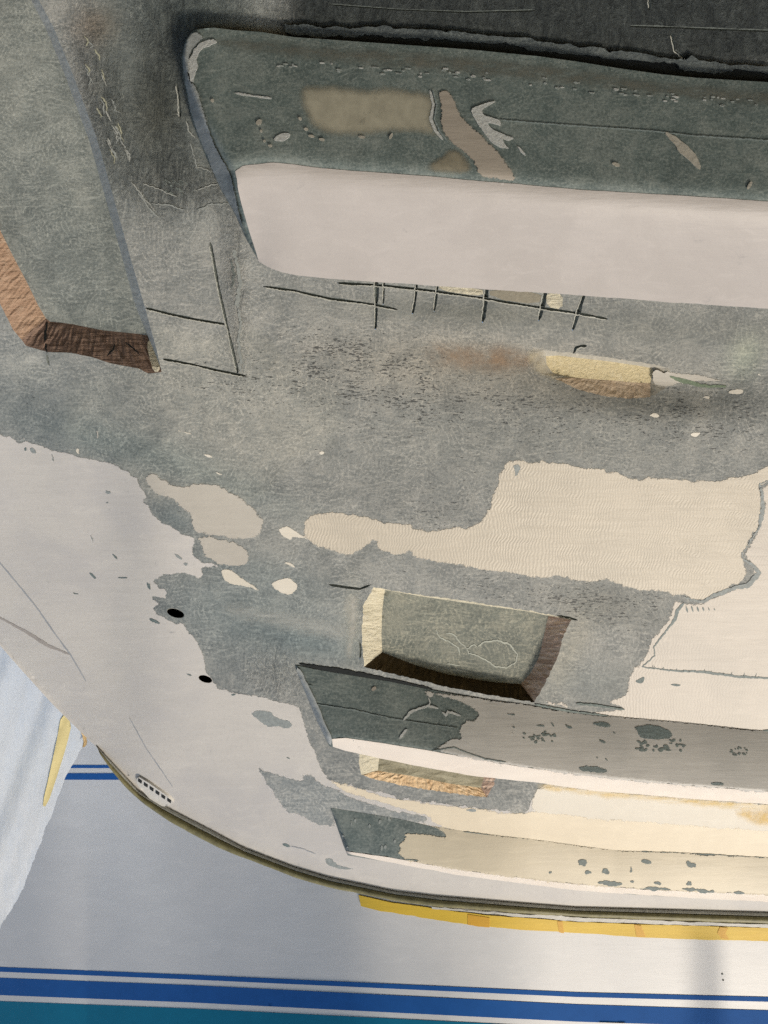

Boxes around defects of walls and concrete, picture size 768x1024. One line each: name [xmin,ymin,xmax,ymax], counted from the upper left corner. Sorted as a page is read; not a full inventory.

peeling [507,714,572,744]
peeling [635,725,686,752]
peeling [579,757,608,773]
peeling [578,859,651,887]
peeling [647,881,714,893]